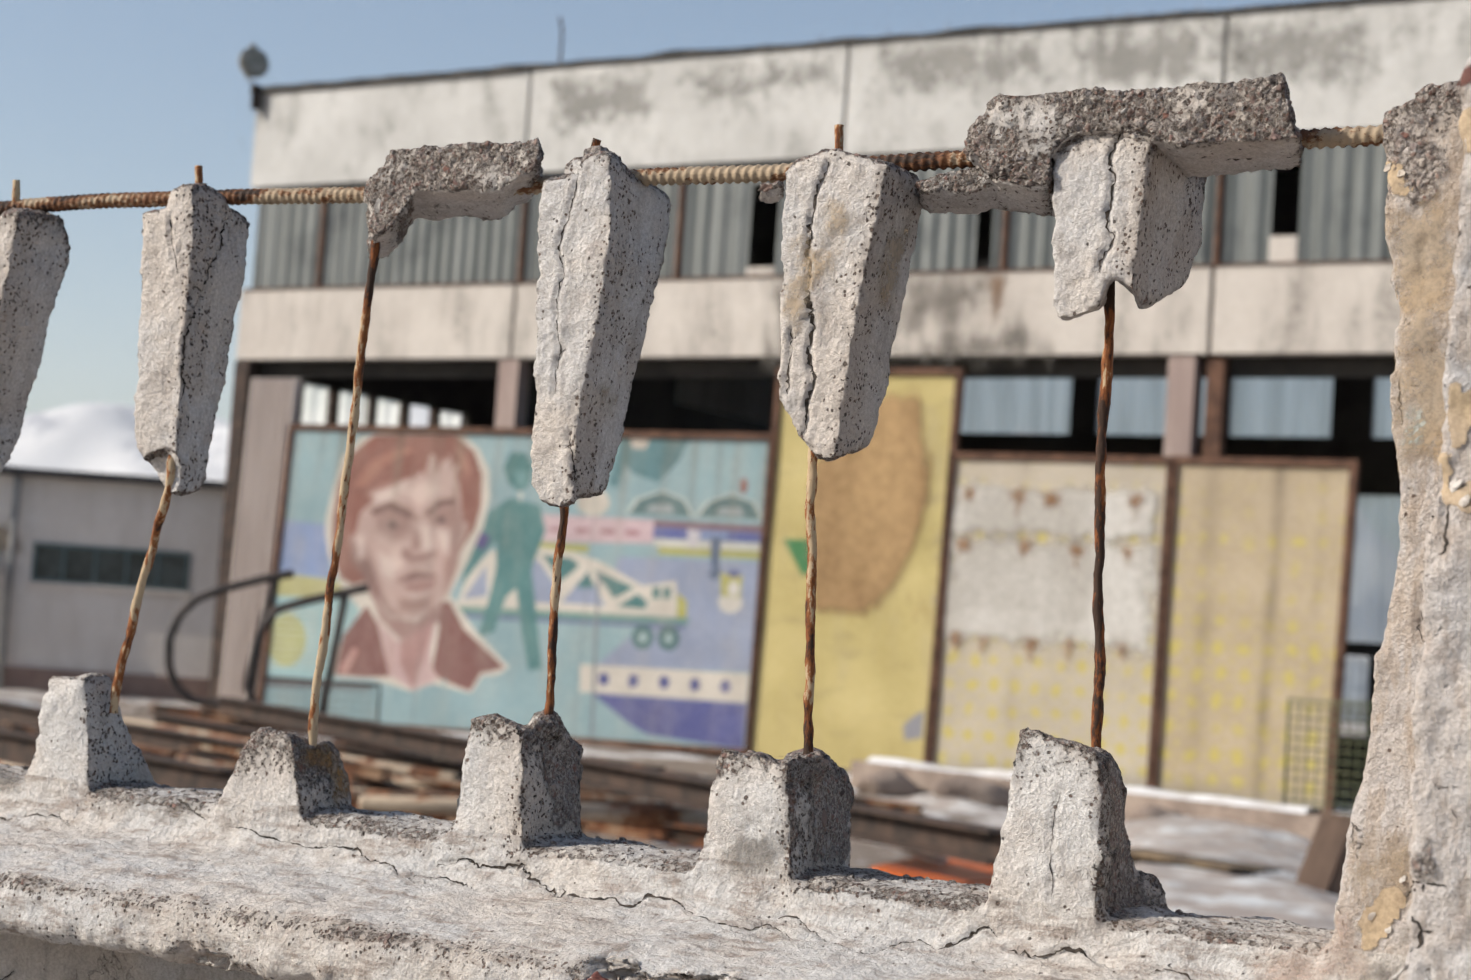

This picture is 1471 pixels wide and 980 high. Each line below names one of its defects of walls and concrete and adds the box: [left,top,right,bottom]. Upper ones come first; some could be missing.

spalling [0,191,171,216]
spalling [217,186,365,205]
spalling [870,150,976,172]
crack [1099,130,1150,272]
crack [785,162,829,430]
peeling [1300,112,1471,513]
peeling [814,395,929,613]
peeling [944,482,1159,658]
crack [0,813,68,823]
crack [179,796,1114,969]
spalling [1105,757,1160,918]
crack [1406,880,1447,980]